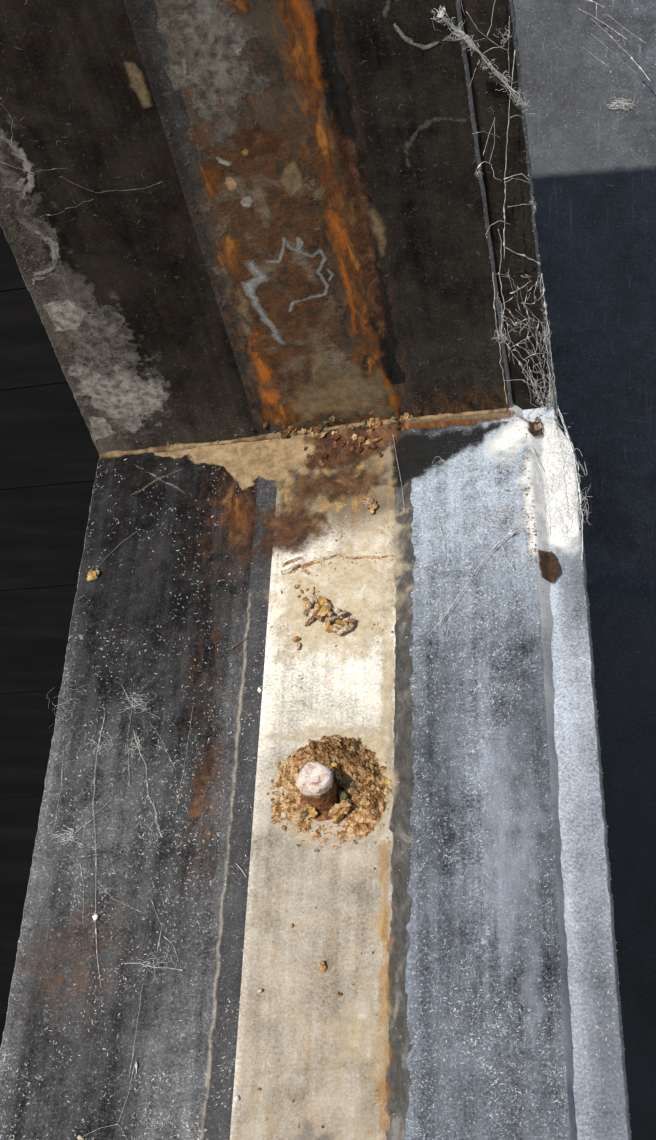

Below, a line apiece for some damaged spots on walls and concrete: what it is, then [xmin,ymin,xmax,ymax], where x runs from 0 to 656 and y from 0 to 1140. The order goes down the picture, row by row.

water stain [0,119,182,440]
rust [158,0,514,560]
peeling [154,434,315,491]